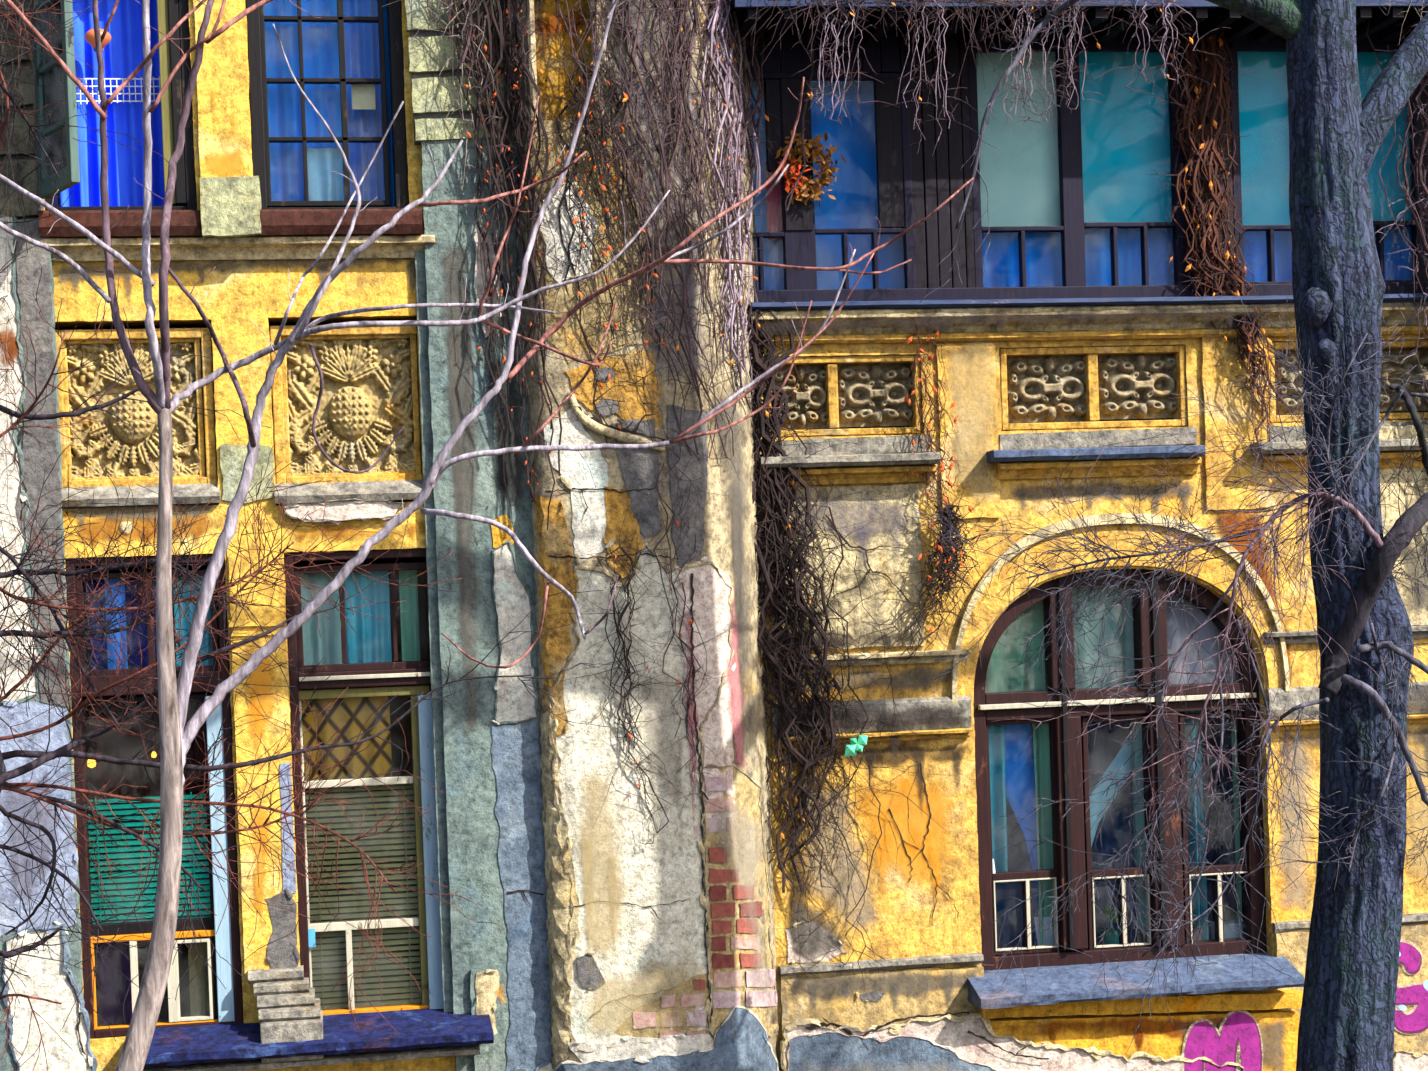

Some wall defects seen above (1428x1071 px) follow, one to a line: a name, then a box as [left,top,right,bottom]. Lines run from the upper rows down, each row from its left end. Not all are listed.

peeling [0,215,42,706]
crack [809,515,910,602]
peeling [491,408,1244,1071]
damp [774,482,1290,954]
peeling [0,921,98,1071]